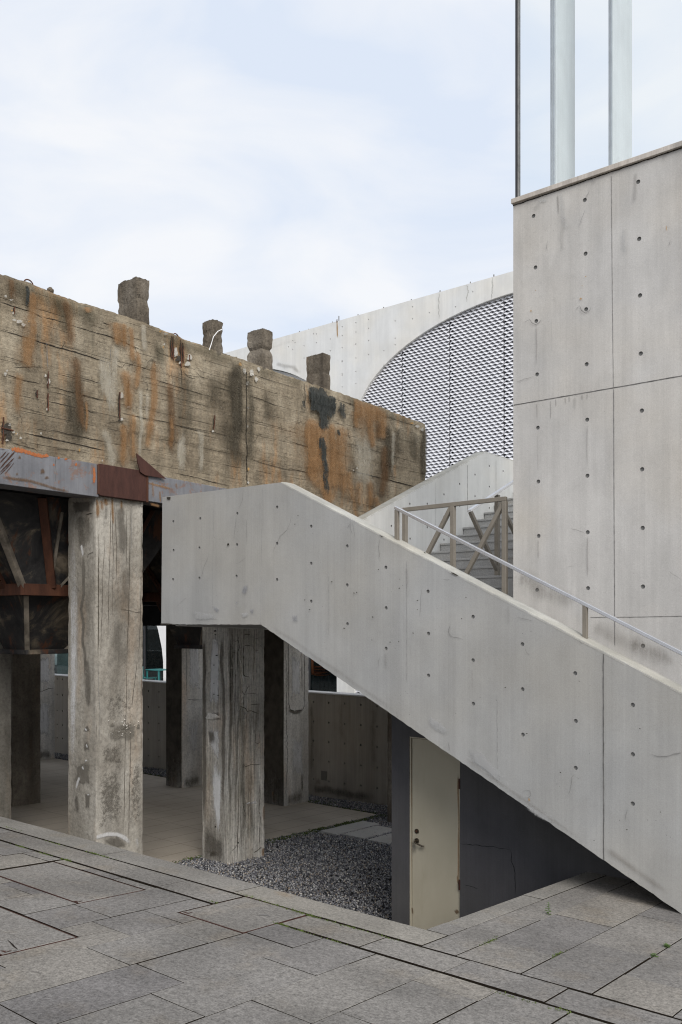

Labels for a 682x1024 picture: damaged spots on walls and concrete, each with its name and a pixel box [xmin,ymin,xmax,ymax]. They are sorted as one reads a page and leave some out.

corrosion [8,447,77,490]
corrosion [114,323,174,449]
leakage [229,365,253,460]
corrosion [306,420,345,501]
corrosion [355,400,388,505]